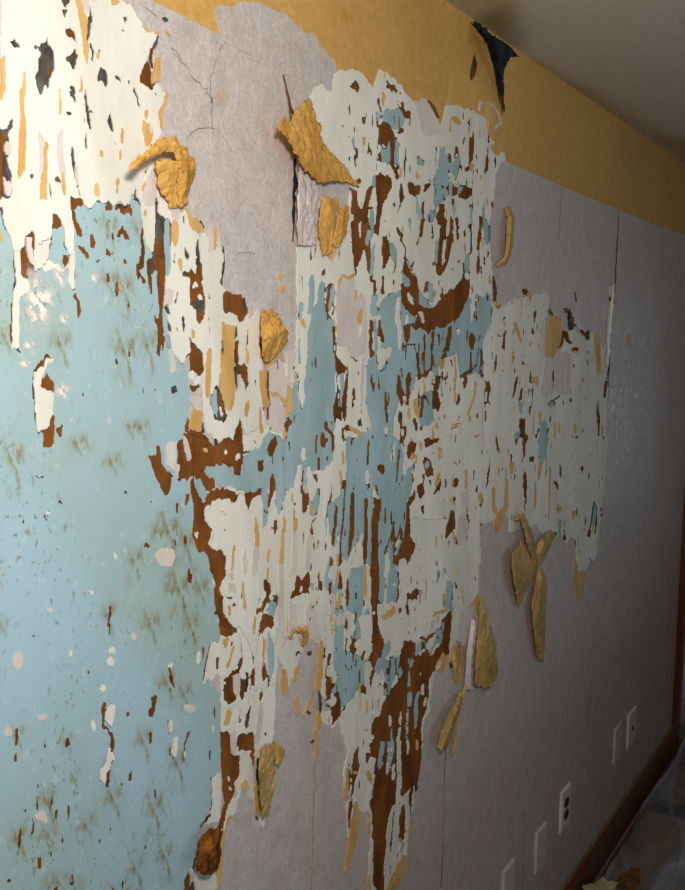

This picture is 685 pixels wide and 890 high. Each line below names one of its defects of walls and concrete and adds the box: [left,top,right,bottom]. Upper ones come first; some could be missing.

peeling [0,0,283,890]
crack [171,44,232,151]
peeling [192,69,613,890]
spalling [490,33,519,77]